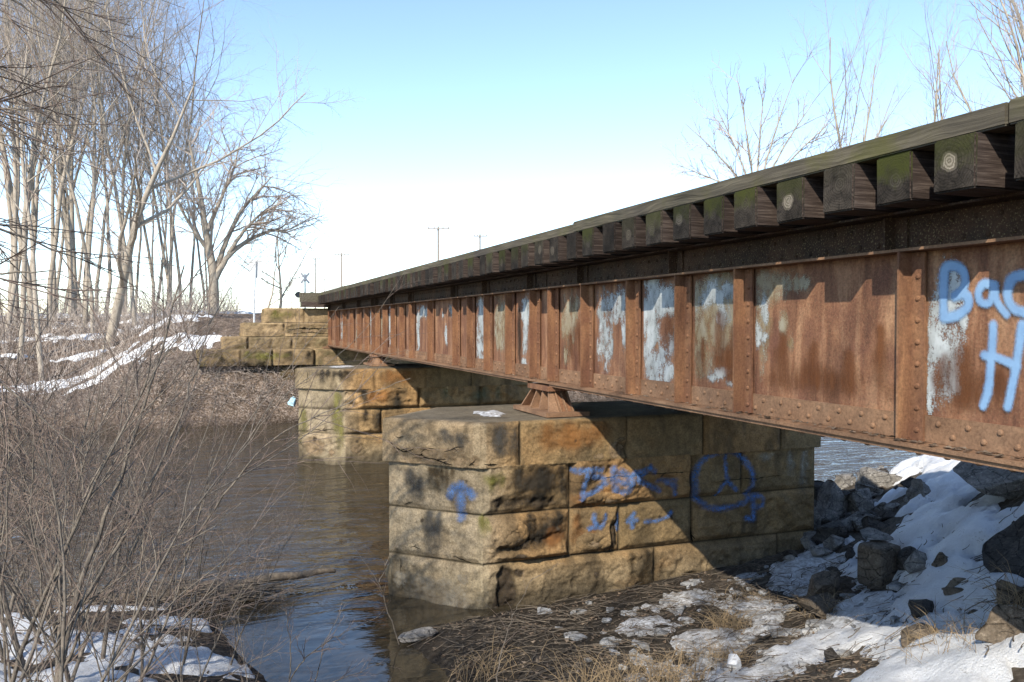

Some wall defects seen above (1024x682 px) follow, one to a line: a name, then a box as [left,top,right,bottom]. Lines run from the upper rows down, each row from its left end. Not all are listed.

peeling [596,285,626,371]
peeling [644,279,674,382]
peeling [694,272,733,386]
rust [700,312,733,381]
peeling [927,271,969,415]
rust [934,348,985,405]
crack [389,436,497,466]